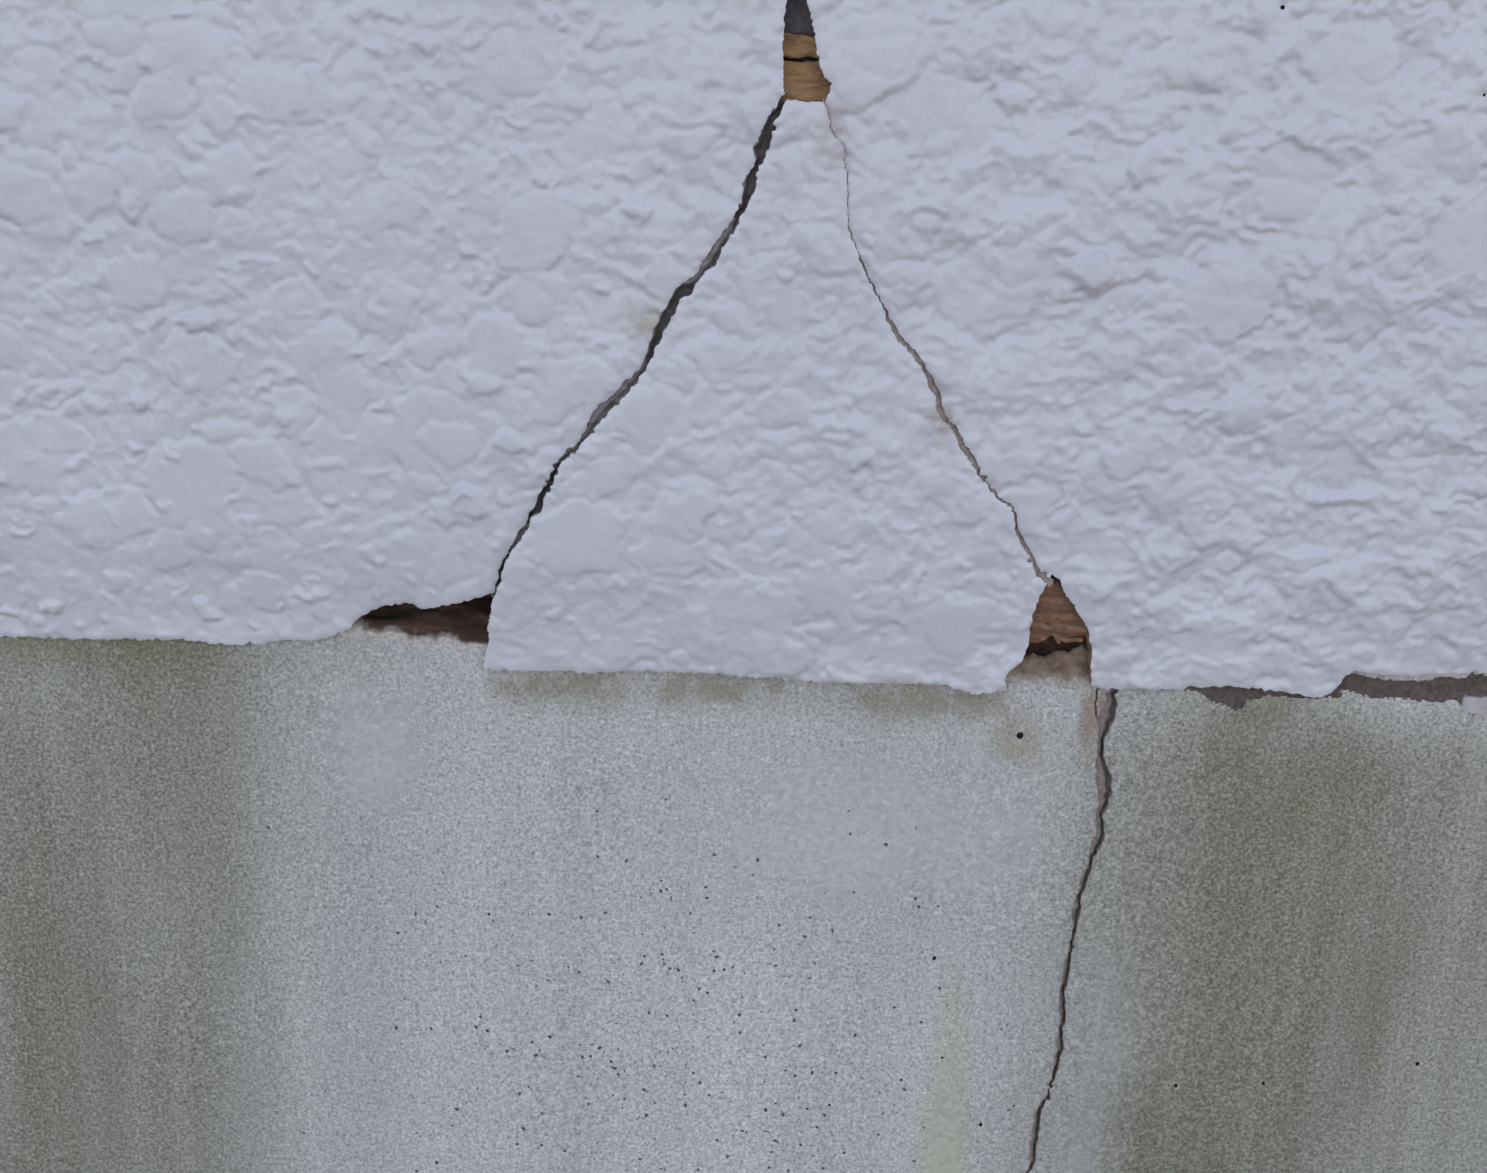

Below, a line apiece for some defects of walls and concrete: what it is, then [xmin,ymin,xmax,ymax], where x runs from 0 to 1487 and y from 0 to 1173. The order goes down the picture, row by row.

spalling [780,0,832,103]
crack [491,91,1054,597]
spalling [341,593,493,650]
spalling [1005,574,1092,689]
peeling [1185,670,1487,717]
crack [1026,688,1118,1173]
spalling [531,1033,628,1079]
spalling [612,1011,738,1118]